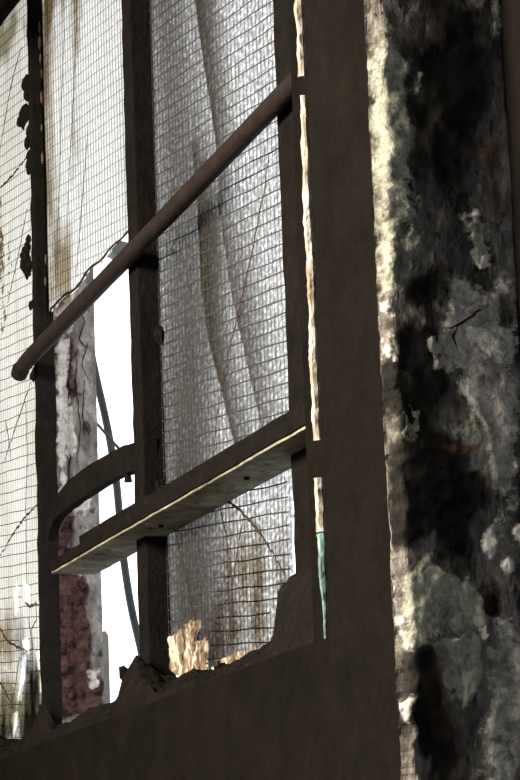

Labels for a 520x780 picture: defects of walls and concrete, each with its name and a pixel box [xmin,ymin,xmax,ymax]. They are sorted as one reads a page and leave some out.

crack [0,382,39,712]
flaking render [366,22,423,313]
flaking render [392,405,420,442]
crack [448,309,482,348]
flaking render [427,270,520,574]
flaking render [461,209,492,270]